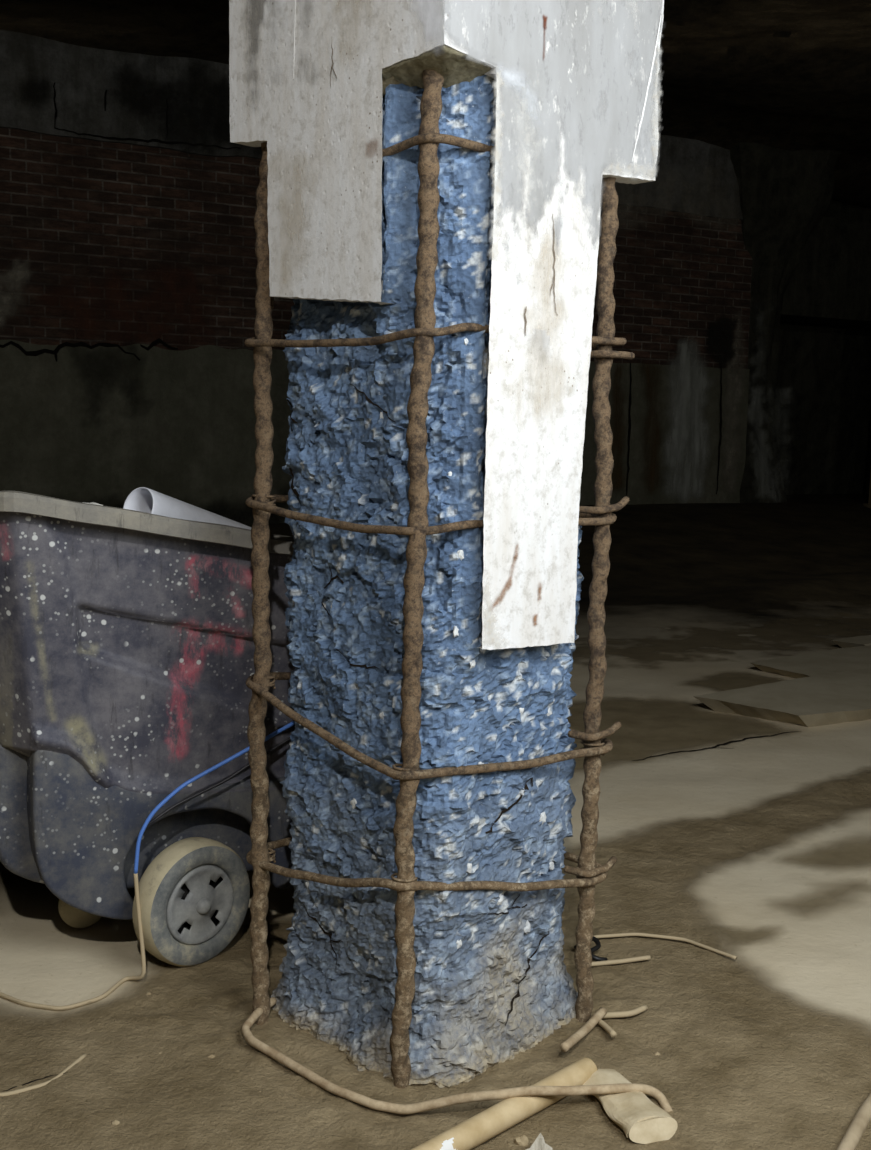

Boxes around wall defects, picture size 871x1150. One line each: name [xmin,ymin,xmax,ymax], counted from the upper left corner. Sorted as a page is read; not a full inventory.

spalling [271,83,424,1079]
spalling [408,0,662,1088]